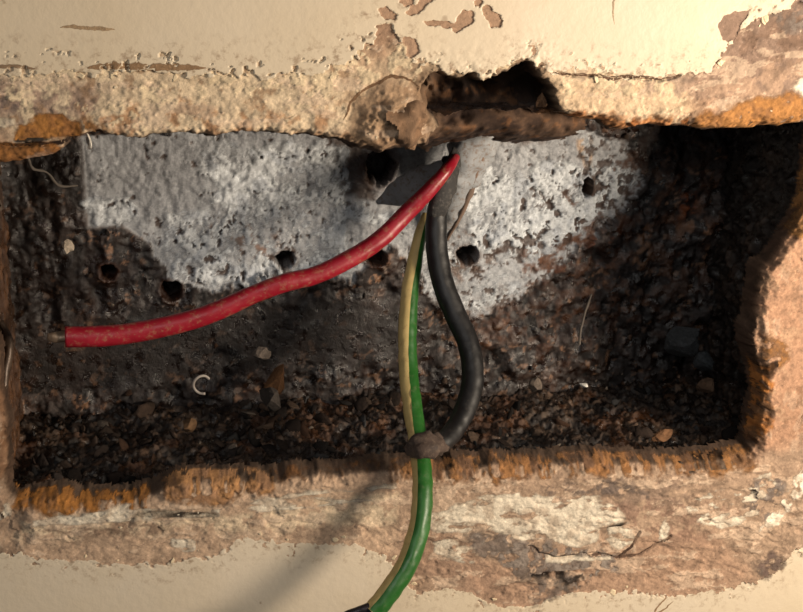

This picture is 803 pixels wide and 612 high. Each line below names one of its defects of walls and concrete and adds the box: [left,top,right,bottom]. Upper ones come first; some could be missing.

flaking render [0,0,803,159]
crack [553,72,677,81]
corrosion [0,113,107,162]
peeling [62,239,74,254]
peeling [408,116,803,612]
corrosion [431,337,789,485]
peeling [0,331,413,575]
corrosion [12,483,149,517]
corrosion [163,465,305,506]
crack [528,534,670,558]